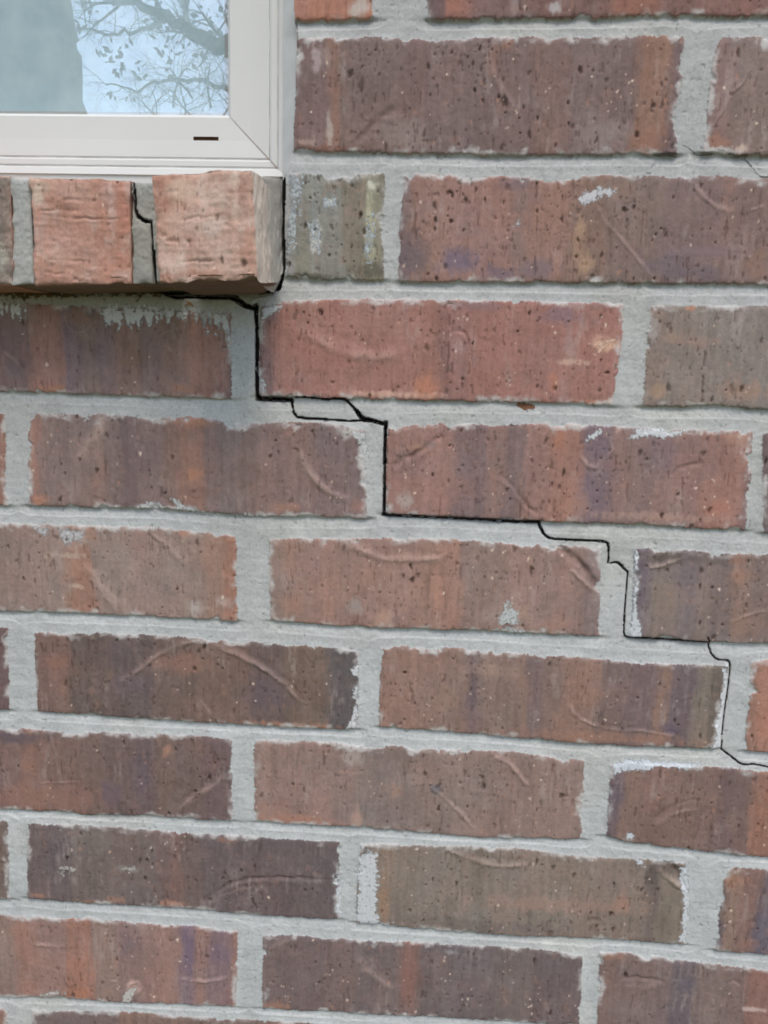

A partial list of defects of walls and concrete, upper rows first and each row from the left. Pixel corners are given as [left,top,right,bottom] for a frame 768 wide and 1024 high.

crack [133,177,768,768]